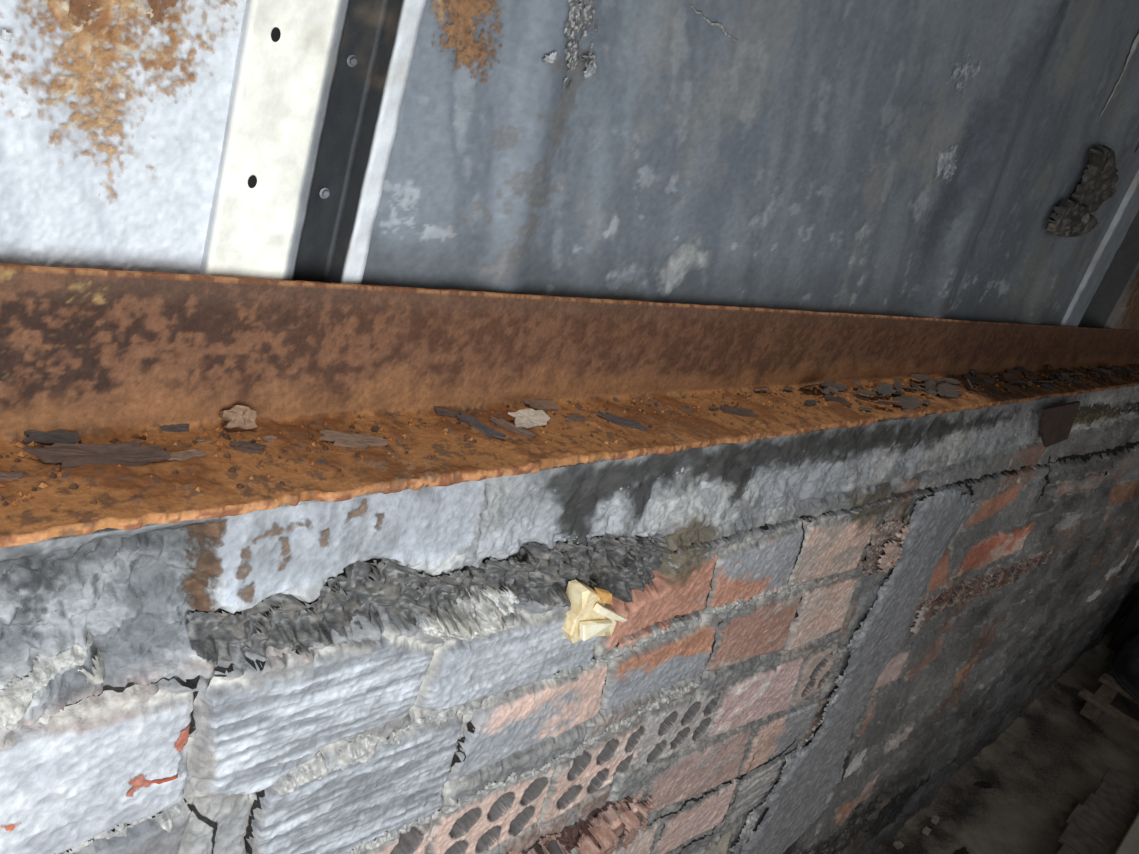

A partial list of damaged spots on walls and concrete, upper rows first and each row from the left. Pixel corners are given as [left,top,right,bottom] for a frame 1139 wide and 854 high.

corrosion [432,0,503,83]
peeling [542,0,598,90]
corrosion [13,0,236,200]
corrosion [219,405,277,453]
corrosion [523,399,649,430]
corrosion [783,369,978,410]
crack [918,442,1139,503]
corrosion [347,499,384,530]
corrosion [181,519,227,612]
corrosion [236,521,330,602]
spalling [185,533,679,664]
spalling [506,796,655,854]